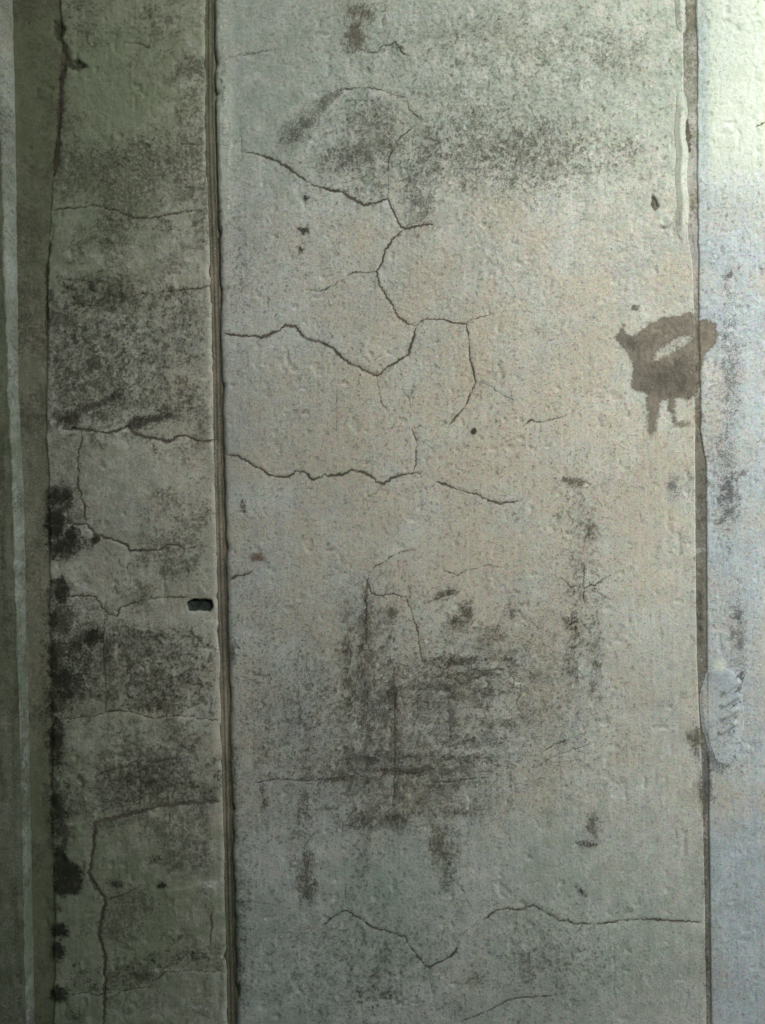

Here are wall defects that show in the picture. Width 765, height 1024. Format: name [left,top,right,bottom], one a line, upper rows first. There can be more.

crack [56,41,532,721]
water stain [614,312,718,439]
mould [43,479,104,561]
water stain [40,575,226,1022]
crack [79,759,221,1024]
water stain [291,851,322,906]
water stain [242,571,594,889]
crack [283,886,700,988]